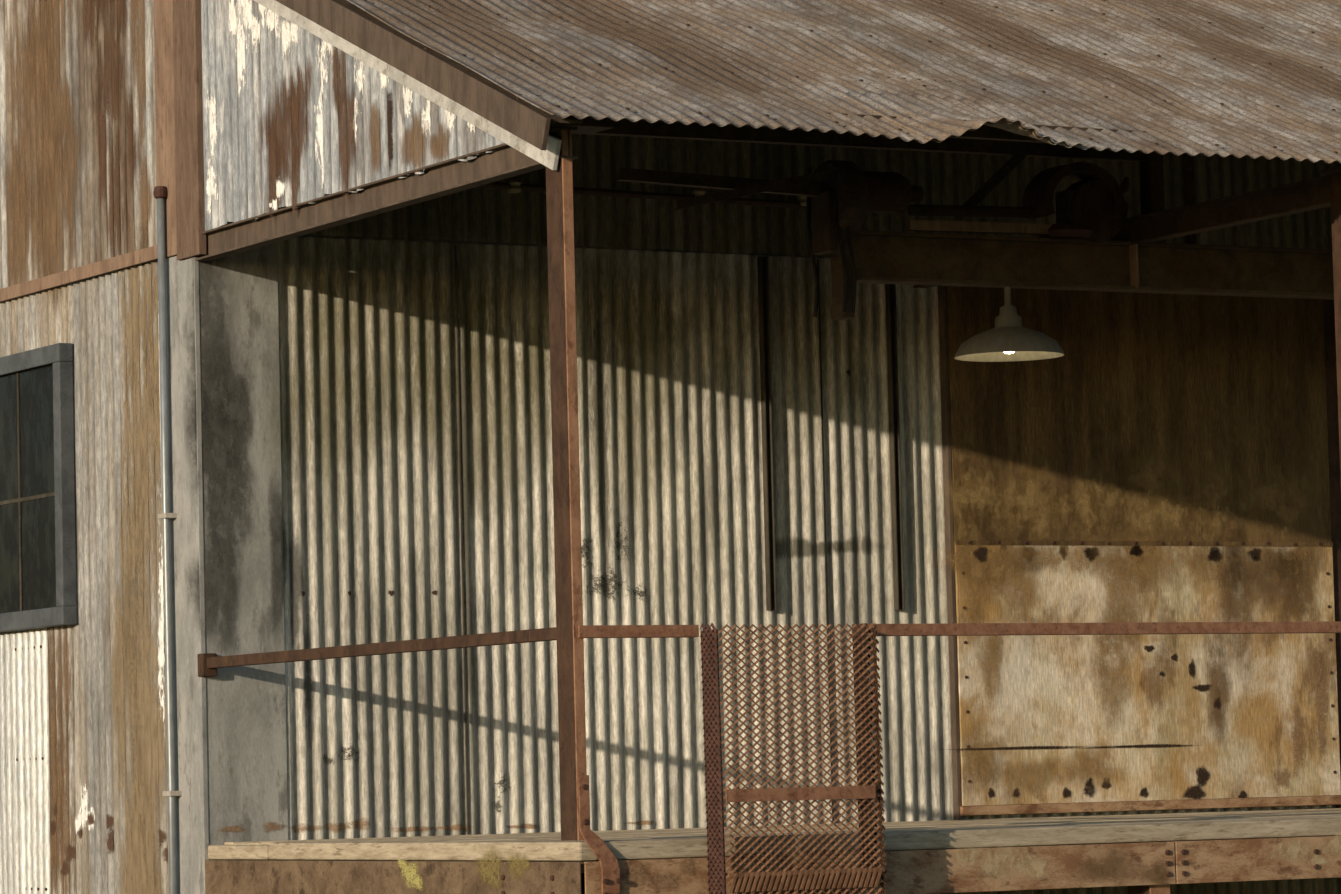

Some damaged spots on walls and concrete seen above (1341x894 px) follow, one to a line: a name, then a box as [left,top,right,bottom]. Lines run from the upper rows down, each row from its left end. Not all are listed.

peeling [228,0,298,97]
peeling [206,76,218,219]
peeling [269,180,285,210]
rust [261,63,311,213]
rust [332,47,355,197]
rust [371,106,381,168]
rust [405,114,449,168]
rust [6,0,168,894]
water stain [187,256,249,646]
rust [949,462,1319,711]
rust [1159,651,1228,736]
rust [1183,767,1210,799]